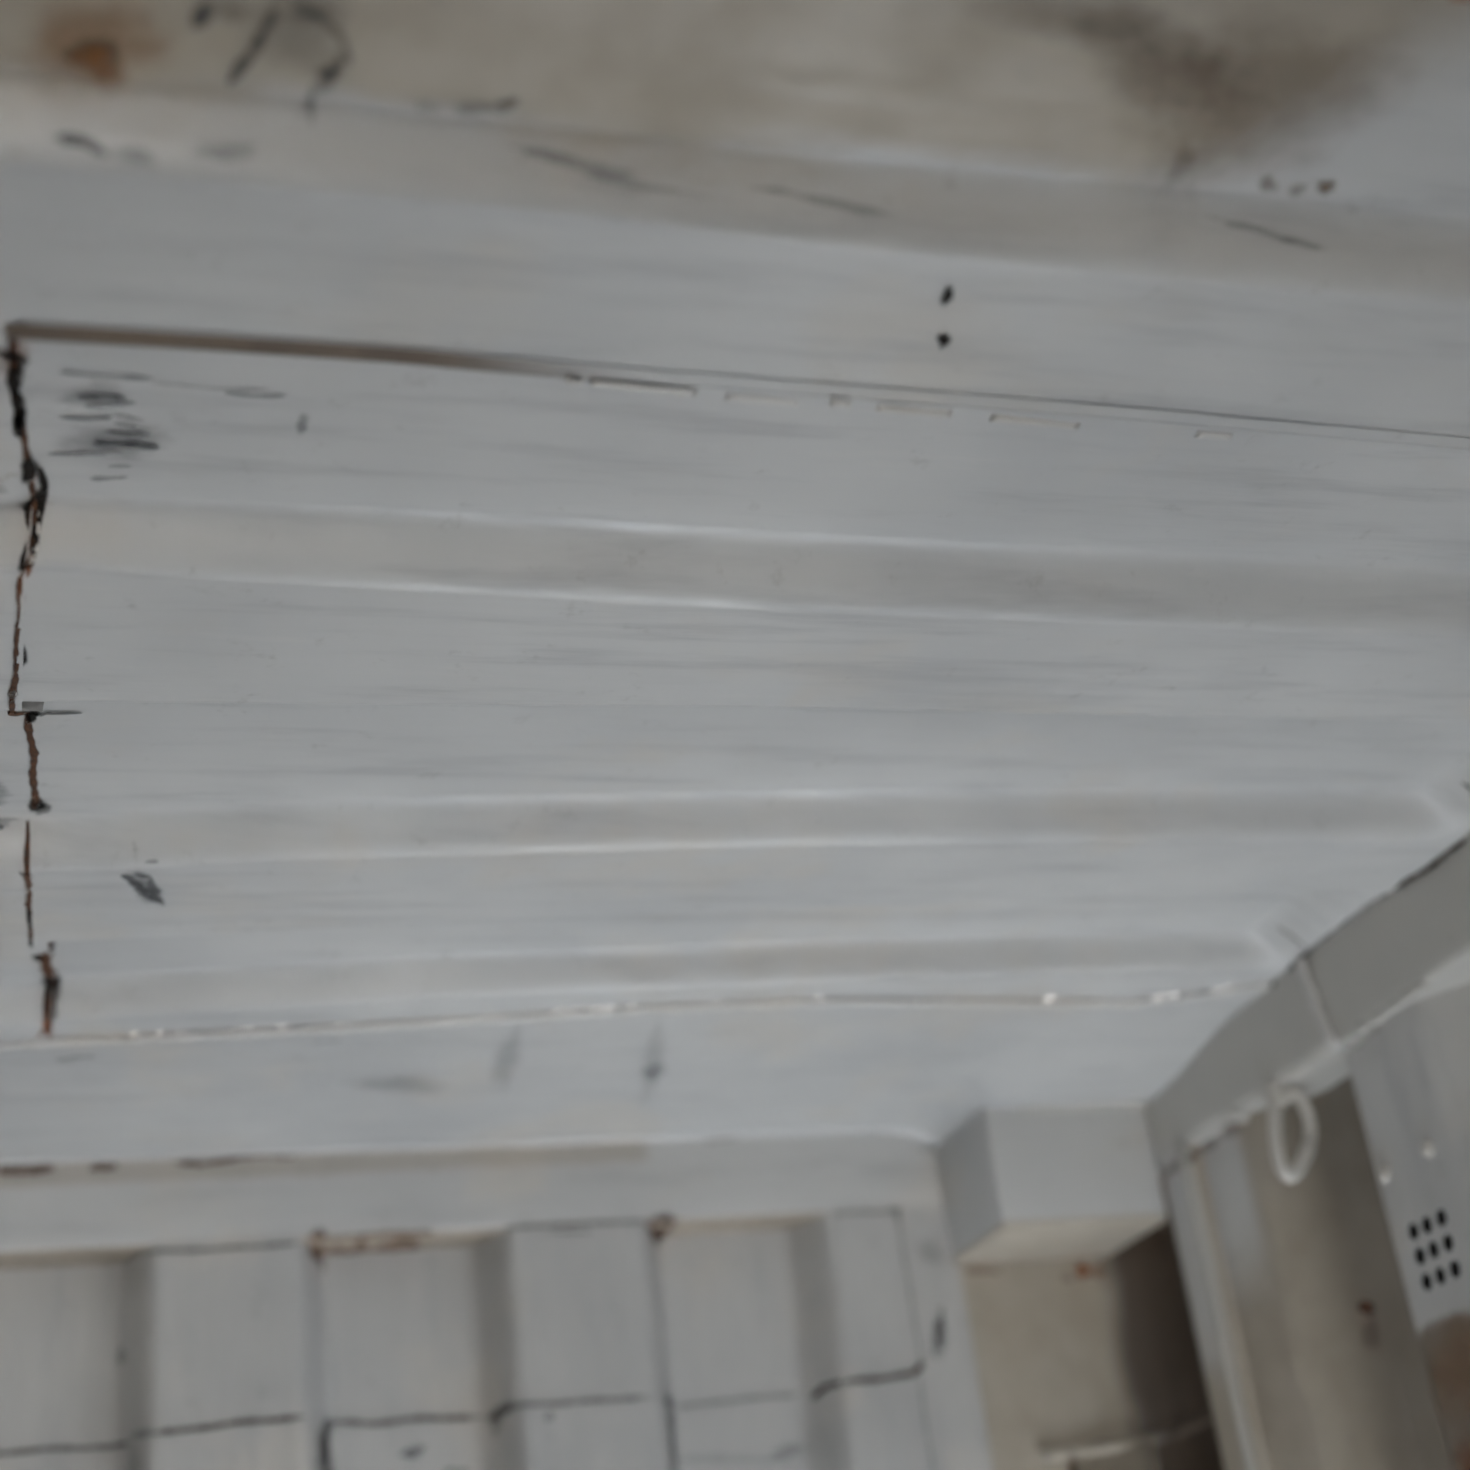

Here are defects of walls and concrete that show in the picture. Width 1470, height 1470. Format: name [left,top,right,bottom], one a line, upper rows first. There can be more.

crack [7,338,58,1032]
crack [1272,839,1466,988]
crack [811,1361,924,1399]
crack [518,1396,646,1407]
crack [0,1415,483,1456]